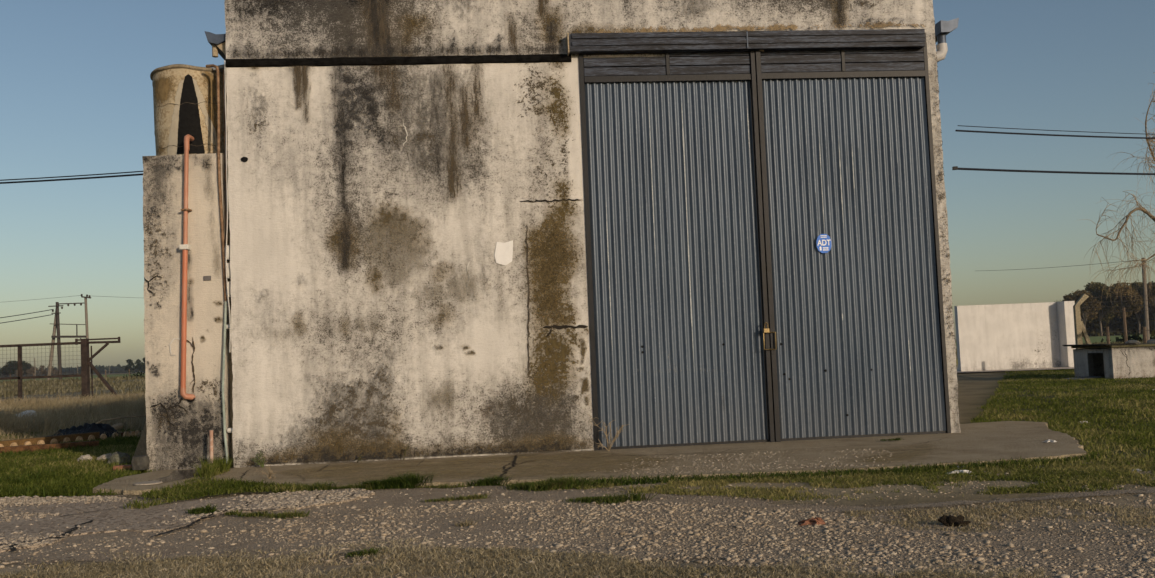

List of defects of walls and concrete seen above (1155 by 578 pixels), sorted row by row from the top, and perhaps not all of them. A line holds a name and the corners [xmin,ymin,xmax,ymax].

damp [531,0,564,54]
damp [833,0,904,30]
damp [230,0,519,291]
damp [148,377,226,482]
damp [247,359,592,465]